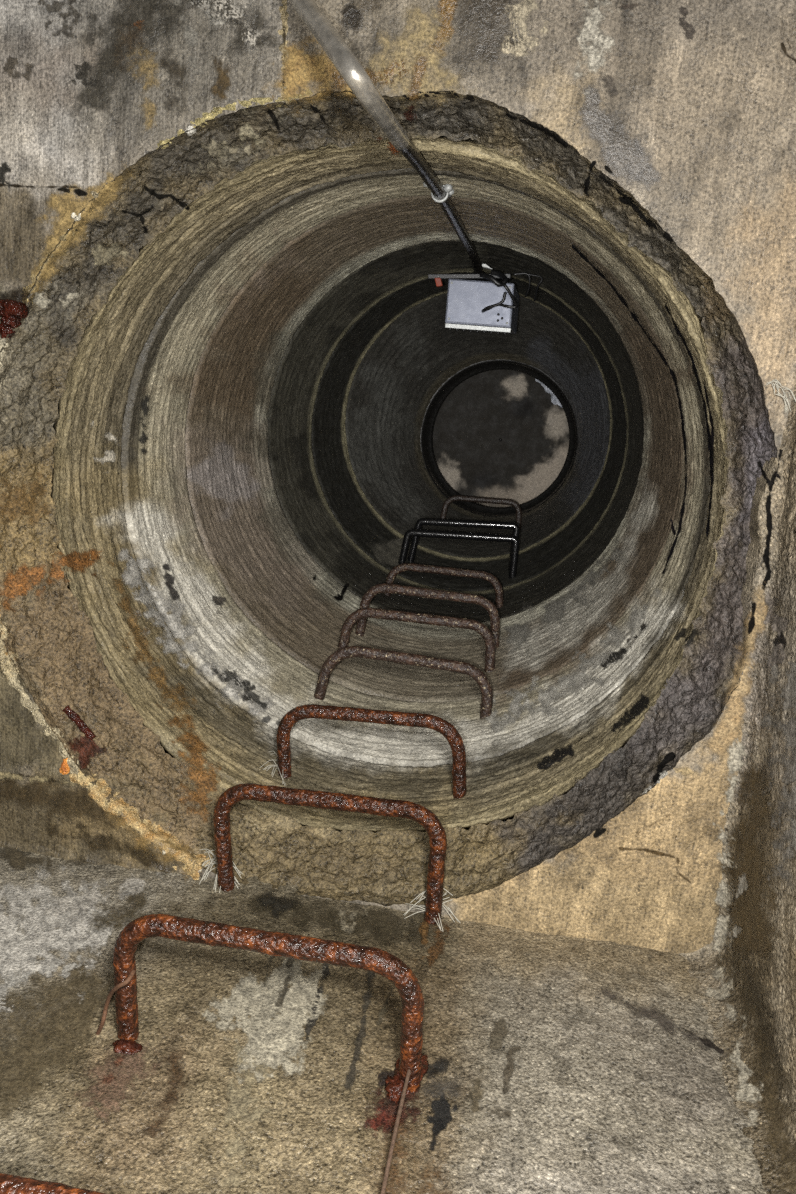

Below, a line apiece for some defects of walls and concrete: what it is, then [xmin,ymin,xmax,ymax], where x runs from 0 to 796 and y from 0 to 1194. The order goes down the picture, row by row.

damp [78,0,354,177]
damp [365,0,548,102]
crack [122,186,190,233]
rust [0,474,48,524]
damp [93,433,117,464]
crack [748,449,783,634]
damp [0,601,211,880]
rust [2,550,221,822]
damp [118,549,273,715]
damp [0,847,146,1115]
damp [202,956,330,1123]
damp [252,892,430,945]